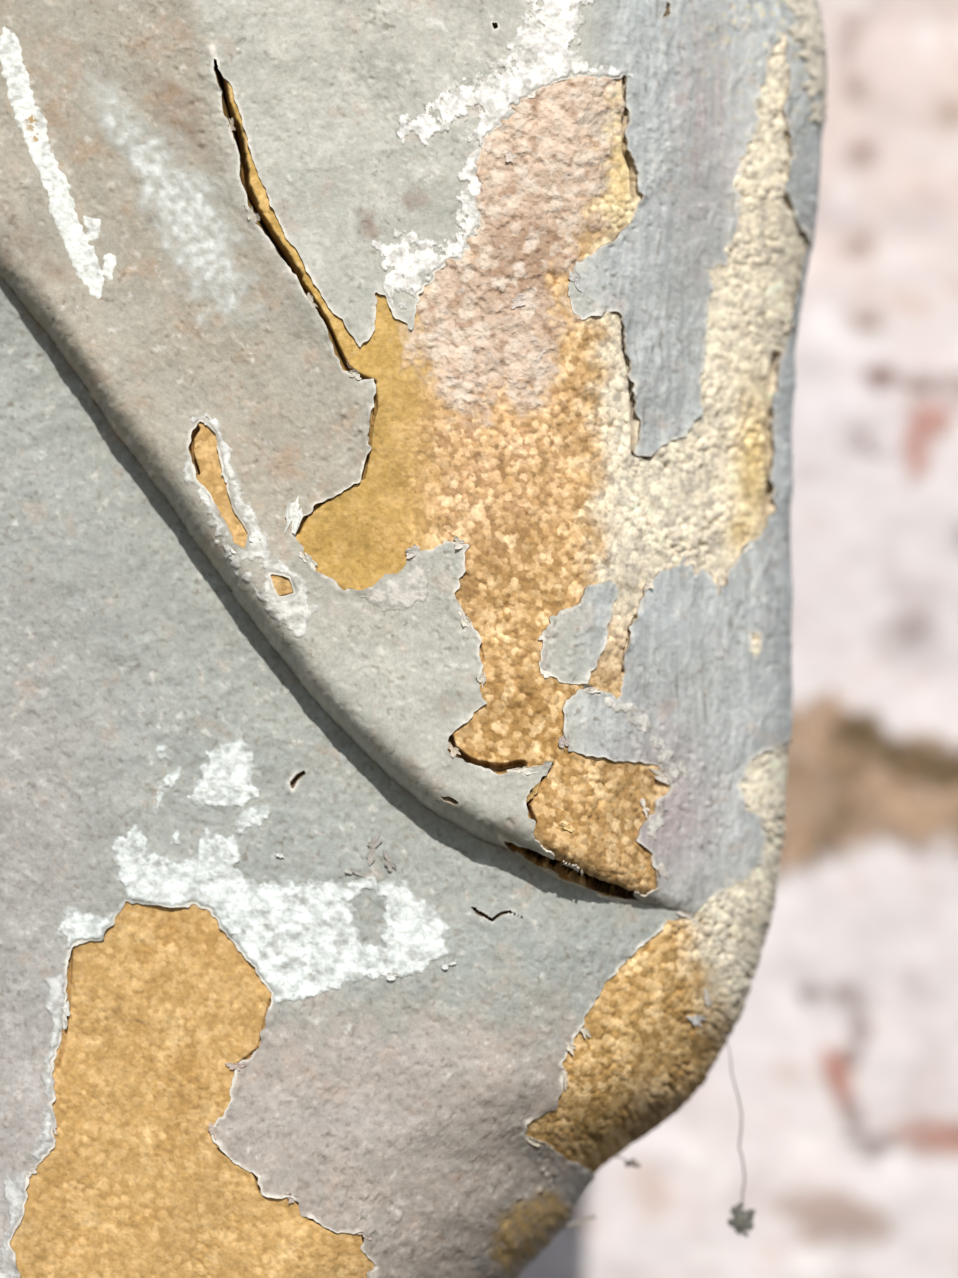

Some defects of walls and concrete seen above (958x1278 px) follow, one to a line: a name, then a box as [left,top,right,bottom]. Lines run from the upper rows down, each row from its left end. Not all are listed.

crack [214,59,362,380]
peeling [183,0,828,900]
peeling [0,740,457,1278]
peeling [525,691,958,1174]